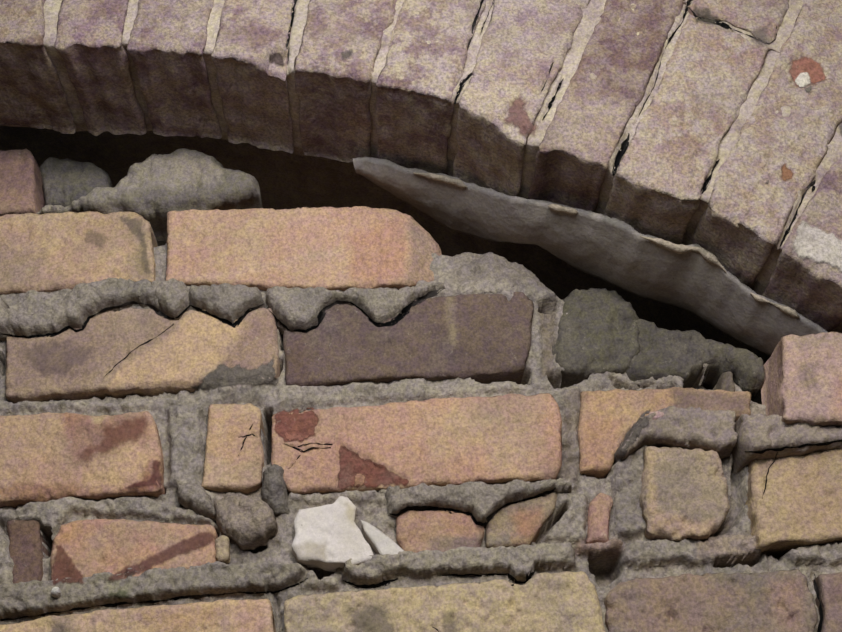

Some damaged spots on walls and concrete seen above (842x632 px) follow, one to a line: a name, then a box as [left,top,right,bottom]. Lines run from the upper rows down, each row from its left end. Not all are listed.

crack [468,0,494,48]
crack [639,0,777,115]
crack [454,73,472,104]
crack [612,133,630,176]
crack [2,288,445,375]
crack [285,443,333,466]